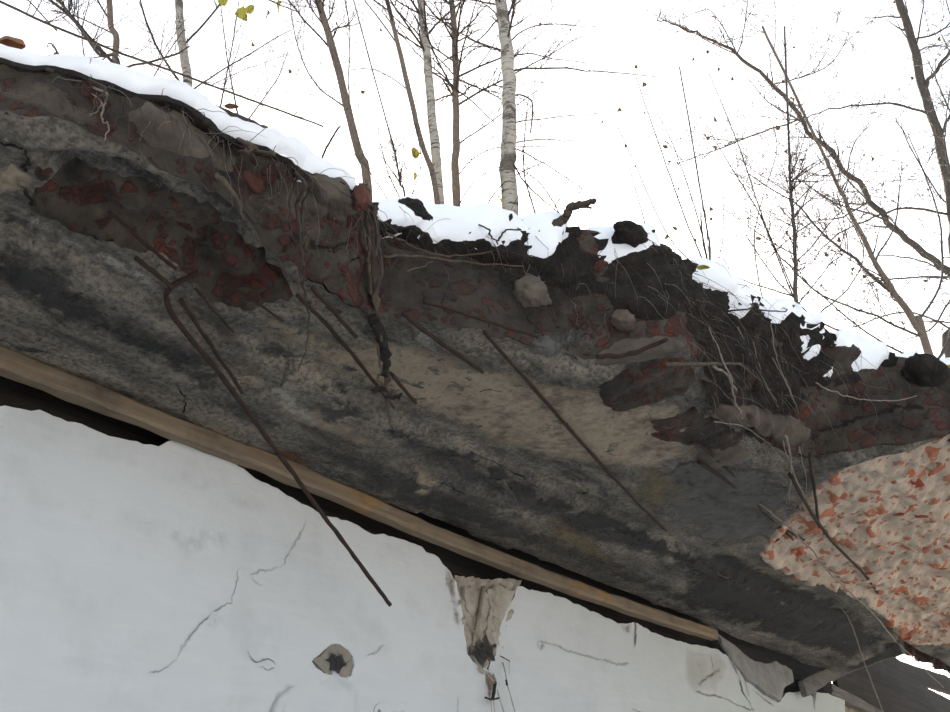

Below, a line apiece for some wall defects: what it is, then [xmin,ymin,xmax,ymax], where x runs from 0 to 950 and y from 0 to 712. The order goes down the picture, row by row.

water stain [61,238,159,291]
spalling [0,64,713,412]
water stain [218,318,747,616]
spalling [650,344,950,646]
crack [151,521,306,673]
spalling [312,644,353,678]
spalling [453,575,522,674]
crack [537,623,637,666]
crack [697,640,774,710]
peeling [718,635,794,701]